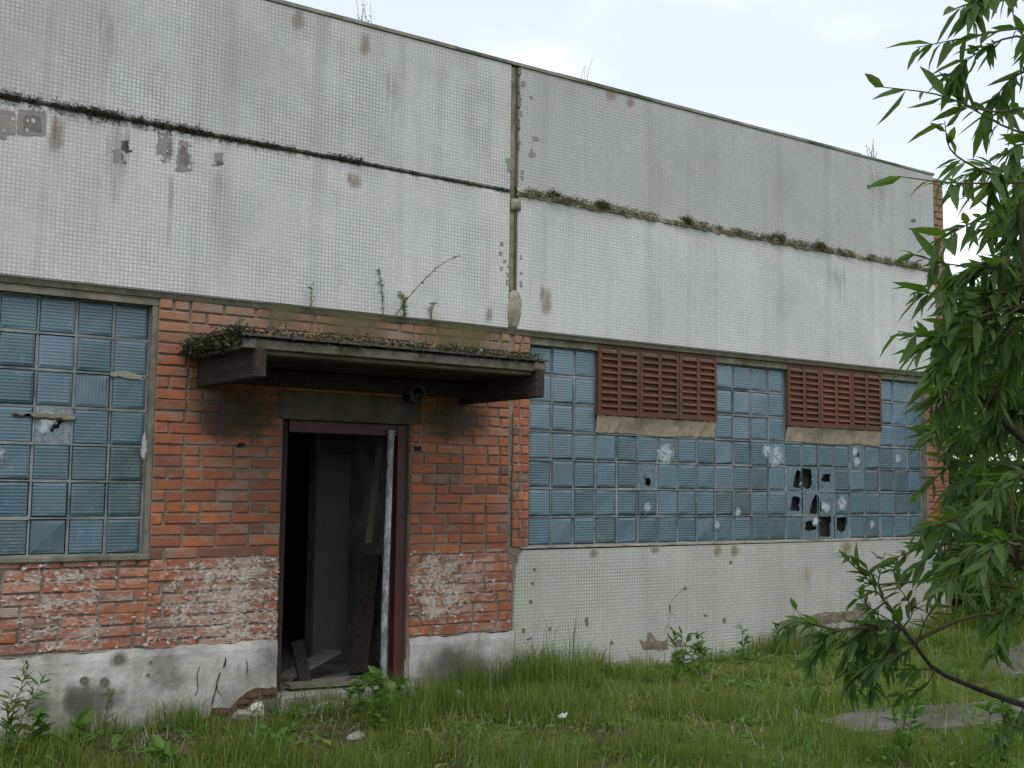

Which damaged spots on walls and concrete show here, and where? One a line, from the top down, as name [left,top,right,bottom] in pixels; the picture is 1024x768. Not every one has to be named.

peeling [0,107,46,140]
peeling [112,140,133,164]
peeling [156,132,194,172]
peeling [212,152,224,166]
peeling [0,561,117,652]
peeling [130,555,281,646]
peeling [409,551,510,627]
spalling [780,602,871,626]
peeling [639,632,691,651]
crack [195,657,248,707]